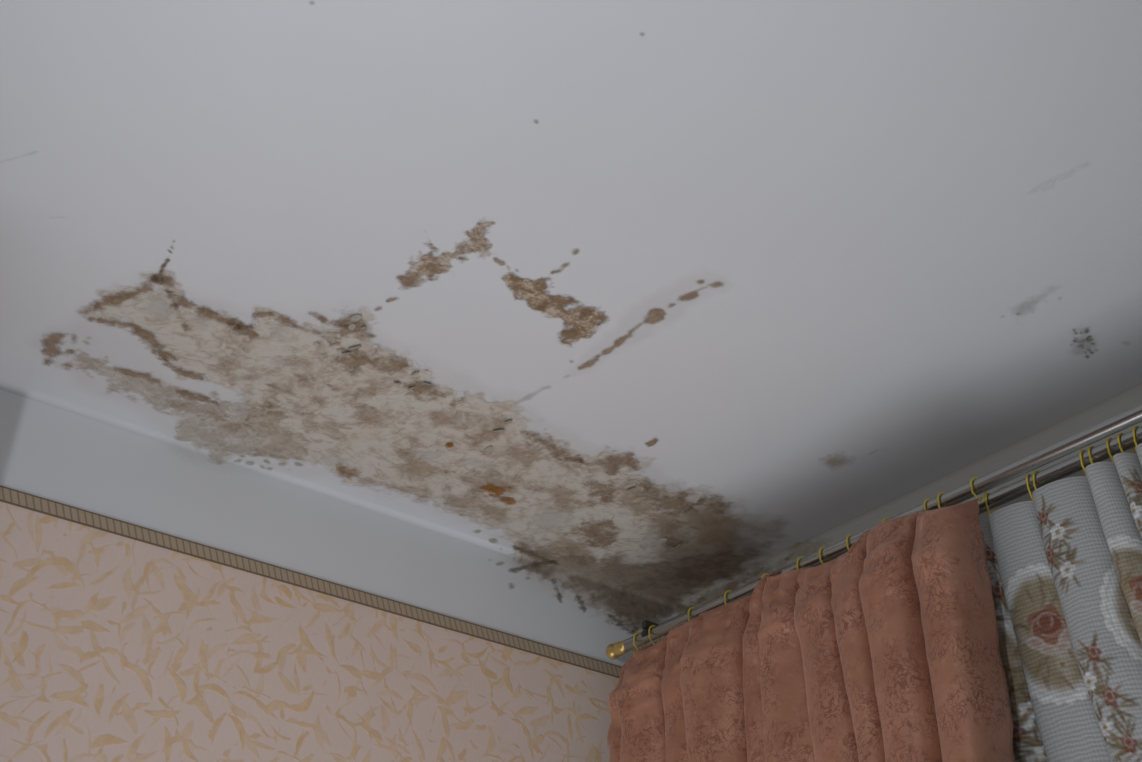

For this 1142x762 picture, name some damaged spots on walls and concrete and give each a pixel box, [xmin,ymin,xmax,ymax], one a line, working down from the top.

damp [397,222,606,344]
damp [42,334,74,366]
damp [80,270,768,634]